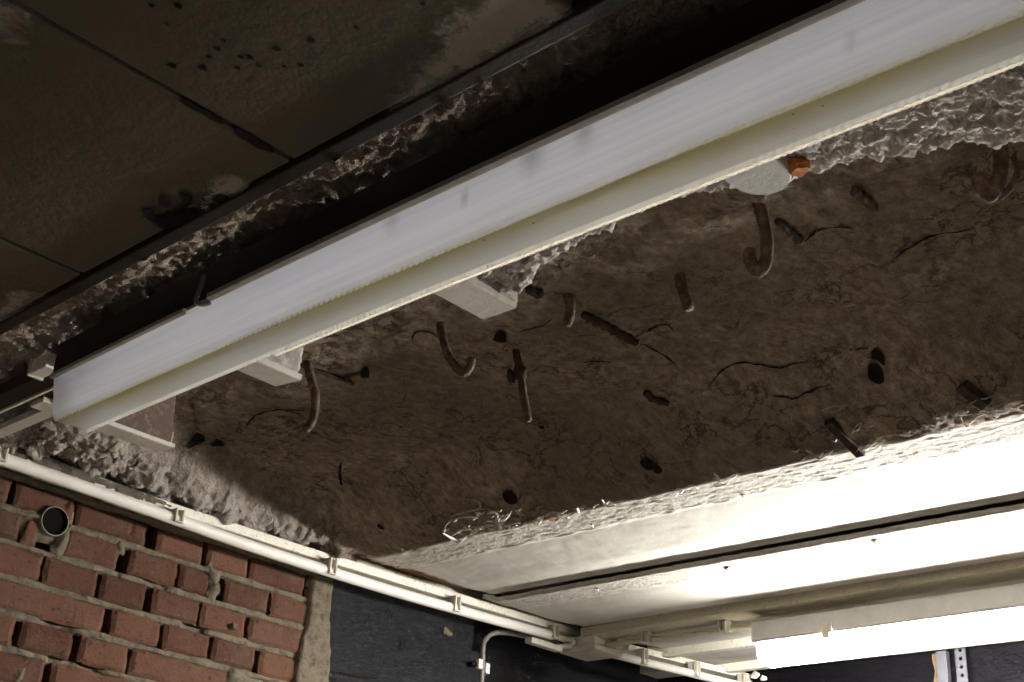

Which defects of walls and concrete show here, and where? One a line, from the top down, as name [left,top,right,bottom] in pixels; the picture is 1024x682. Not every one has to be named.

corrosion [787,156,810,177]
spalling [969,144,1020,203]
spalling [743,203,804,278]
crack [805,226,853,241]
crack [897,228,975,258]
spalling [525,285,544,299]
spalling [562,293,639,346]
spalling [302,360,320,433]
spalling [507,349,532,422]
crack [709,360,812,385]
crack [774,384,830,400]
peeling [442,498,523,544]